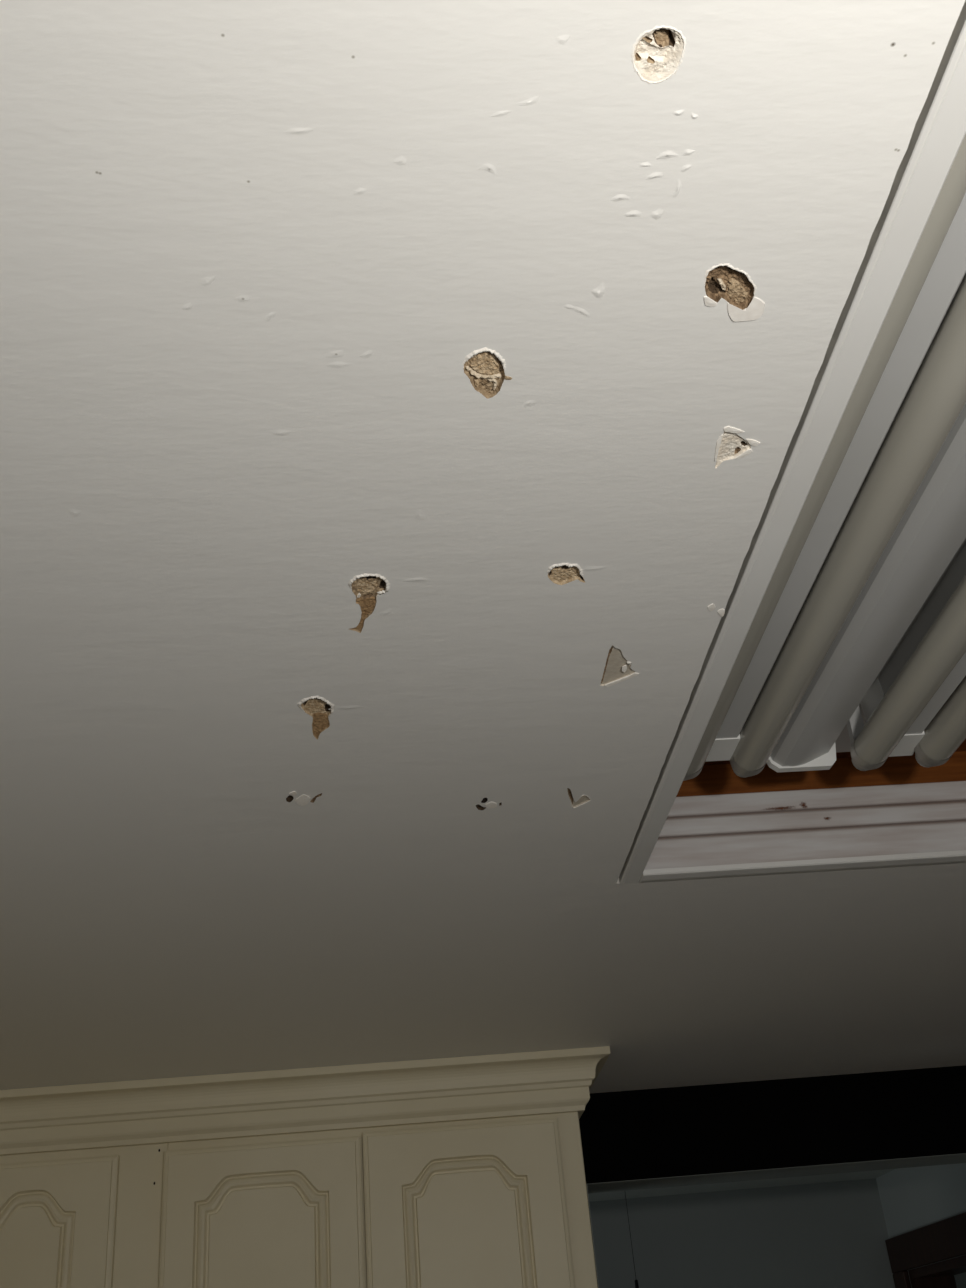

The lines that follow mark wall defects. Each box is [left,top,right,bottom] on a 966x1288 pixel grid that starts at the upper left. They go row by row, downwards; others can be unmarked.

spalling [631,25,686,84]
spalling [704,263,765,322]
spalling [463,347,512,399]
peeling [714,426,760,469]
spalling [547,563,608,585]
spalling [348,573,429,633]
peeling [600,645,639,687]
spalling [297,696,366,740]
spalling [286,791,322,806]
spalling [476,798,502,810]
peeling [567,788,591,808]